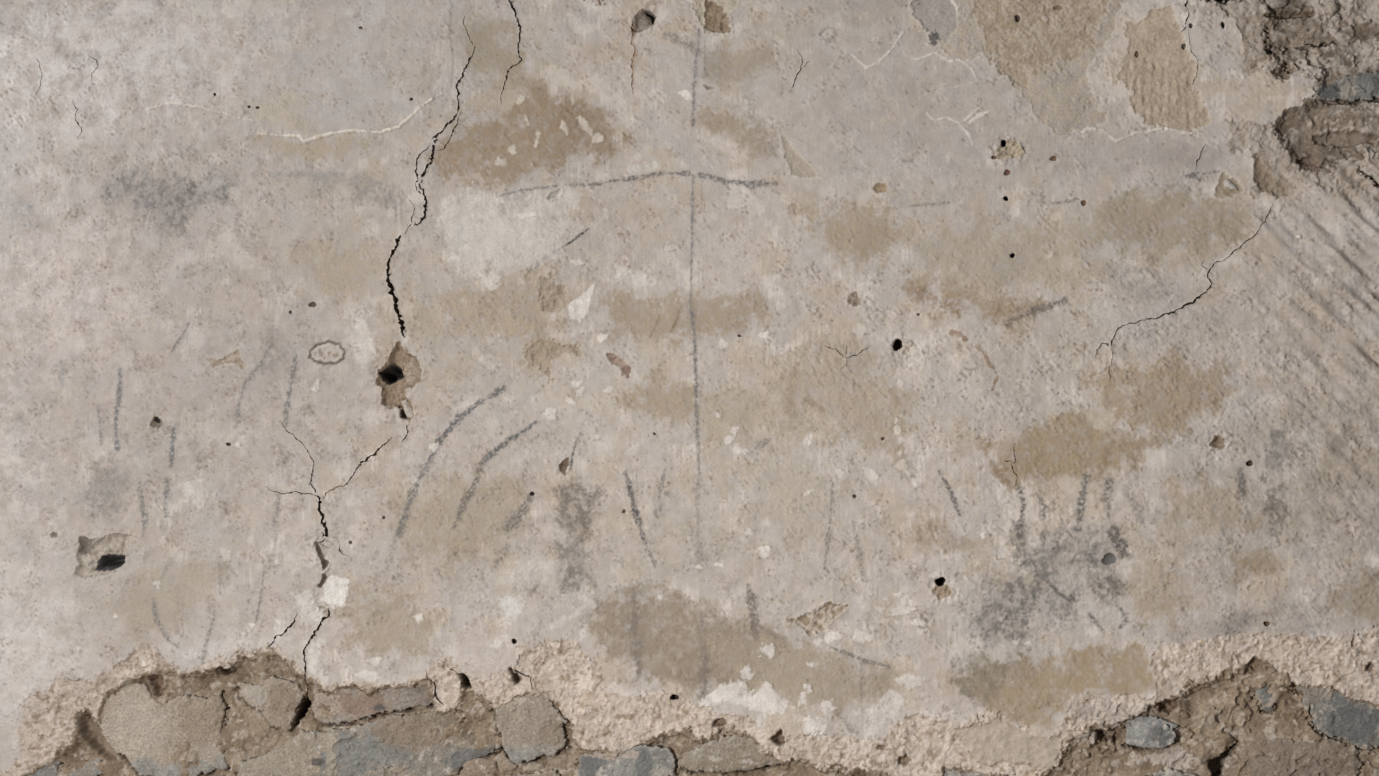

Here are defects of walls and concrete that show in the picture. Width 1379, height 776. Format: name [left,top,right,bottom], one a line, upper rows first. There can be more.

crack [499,0,524,106]
flaking render [692,0,738,34]
spalling [909,0,1379,217]
crack [384,16,476,338]
crack [1094,204,1274,381]
spalling [376,341,422,422]
crack [265,421,411,558]
spalling [74,533,129,580]
spalling [314,541,329,588]
crack [266,609,332,695]
spalling [0,591,1379,776]